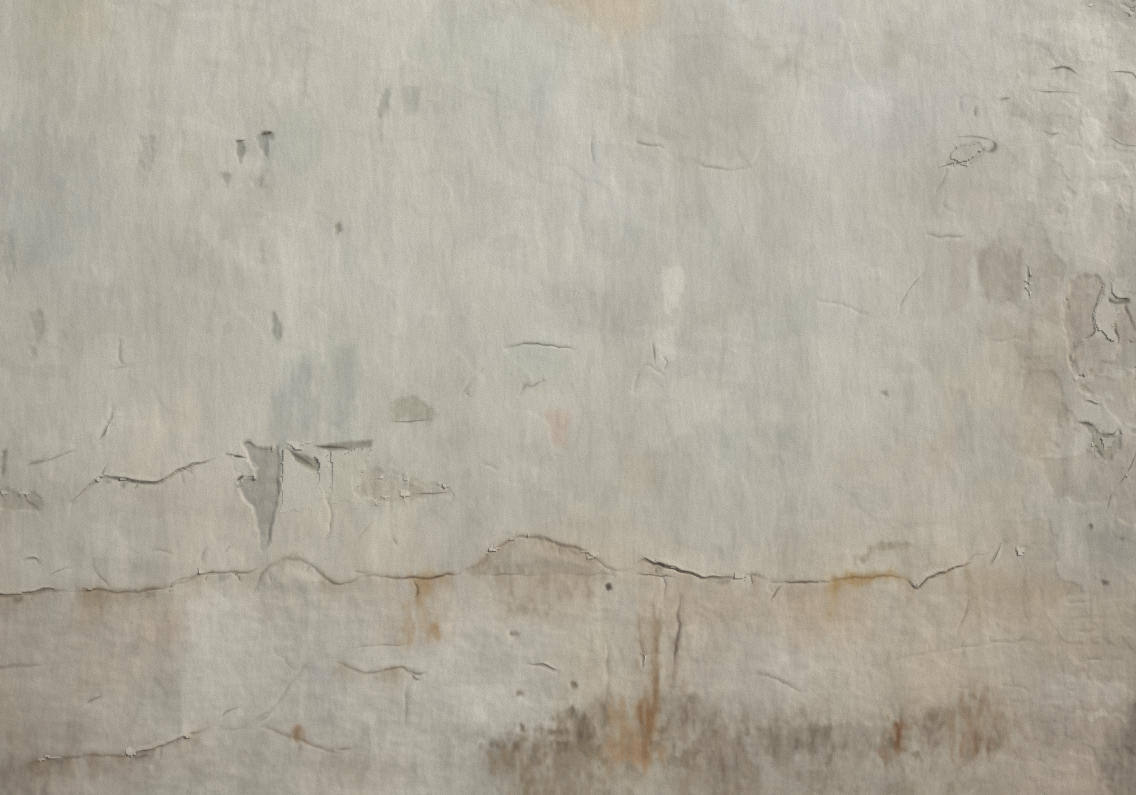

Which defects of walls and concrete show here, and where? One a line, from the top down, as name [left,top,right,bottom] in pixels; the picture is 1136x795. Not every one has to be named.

peeling [937,134,1001,169]
peeling [1061,272,1136,381]
peeling [1074,418,1123,464]
peeling [227,438,460,553]
crack [0,496,1005,669]
crack [527,661,560,673]
damp [485,697,612,755]
corrosion [590,686,671,784]
damp [630,610,746,795]
crack [754,673,803,693]
damp [805,718,851,762]
damp [1089,699,1136,795]